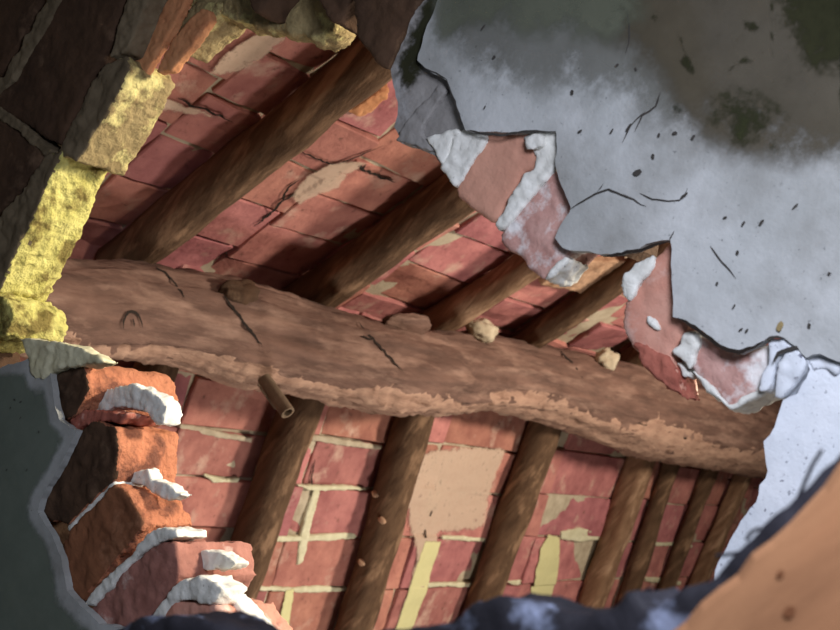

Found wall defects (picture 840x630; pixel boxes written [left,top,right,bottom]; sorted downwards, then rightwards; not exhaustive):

flaking render [391,0,464,164]
leakage [437,0,686,117]
crack [623,94,660,141]
peeling [524,133,547,150]
crack [254,180,299,227]
crack [571,186,688,209]
spalling [538,256,626,293]
crack [224,295,263,347]
peeling [647,316,661,331]
crack [360,324,403,371]